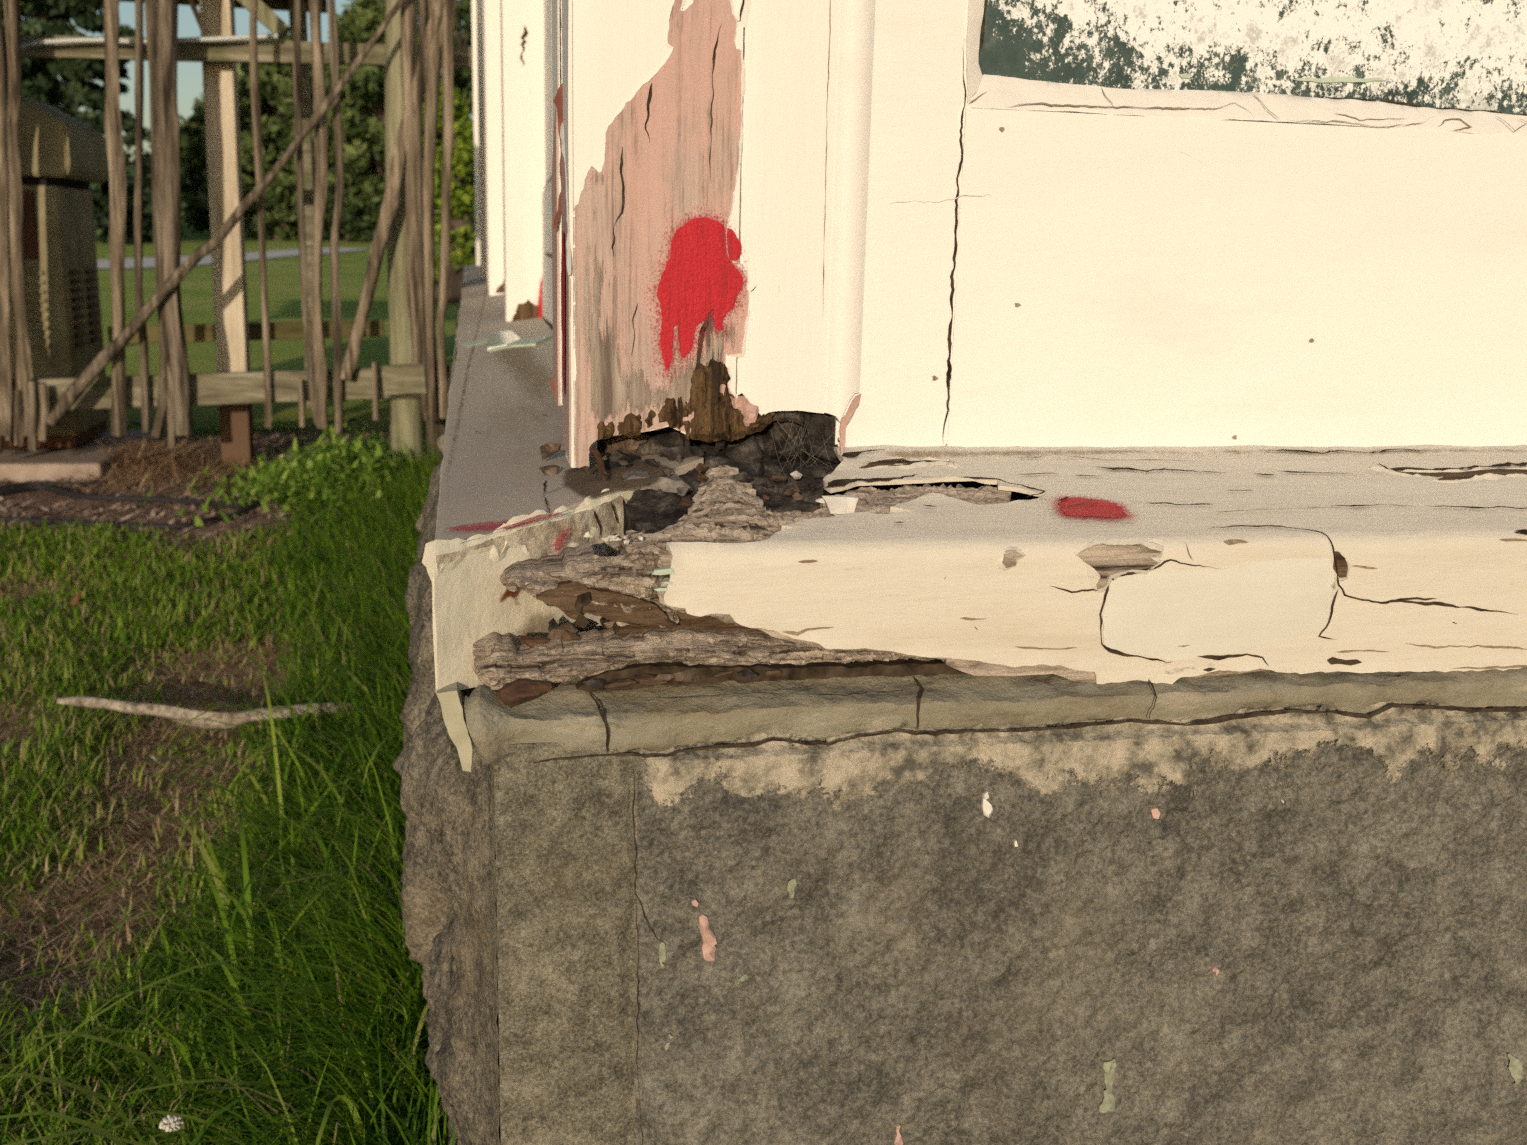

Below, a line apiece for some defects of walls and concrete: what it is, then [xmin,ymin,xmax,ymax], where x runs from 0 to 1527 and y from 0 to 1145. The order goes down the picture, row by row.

peeling [496,0,766,468]
crack [611,83,652,256]
crack [709,0,751,179]
crack [823,0,831,290]
crack [890,0,1527,444]
crack [695,312,710,370]
peeling [422,489,633,582]
peeling [849,457,961,491]
peeling [1074,538,1164,593]
peeling [1329,549,1351,581]
peeling [1369,465,1527,483]
crack [491,449,1527,1145]